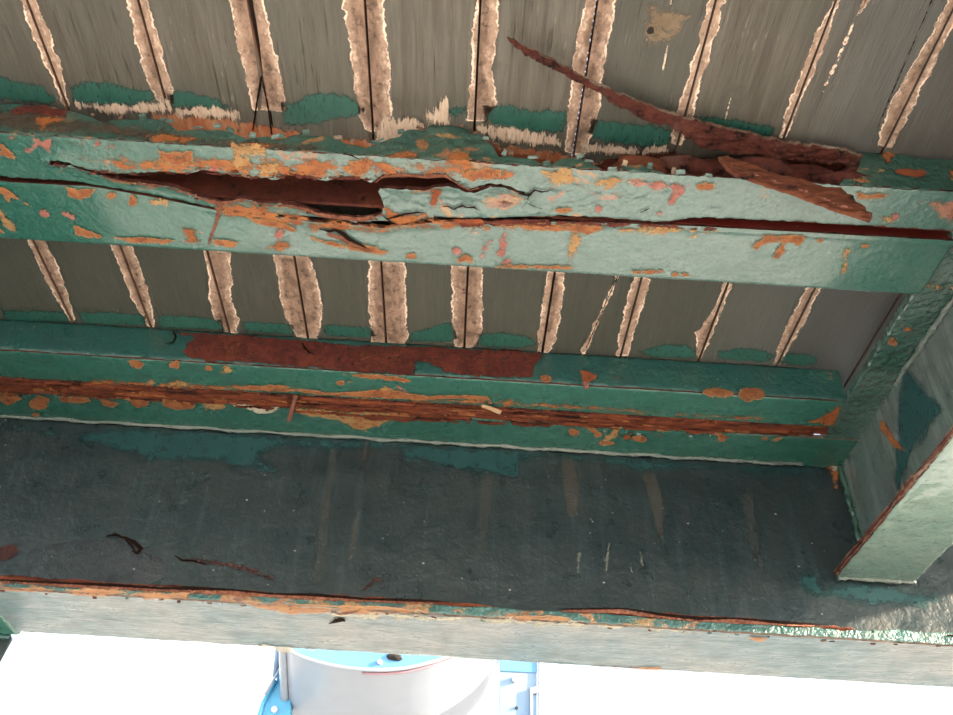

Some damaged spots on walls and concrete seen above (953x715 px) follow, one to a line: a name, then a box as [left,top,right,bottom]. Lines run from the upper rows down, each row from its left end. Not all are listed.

rust [882,152,926,178]
crack [383,205,478,225]
rust [929,202,953,221]
crack [320,229,372,252]
rust [0,359,841,446]
rust [880,420,905,452]
rust [833,425,953,577]
crack [106,533,143,554]
crack [562,607,822,627]